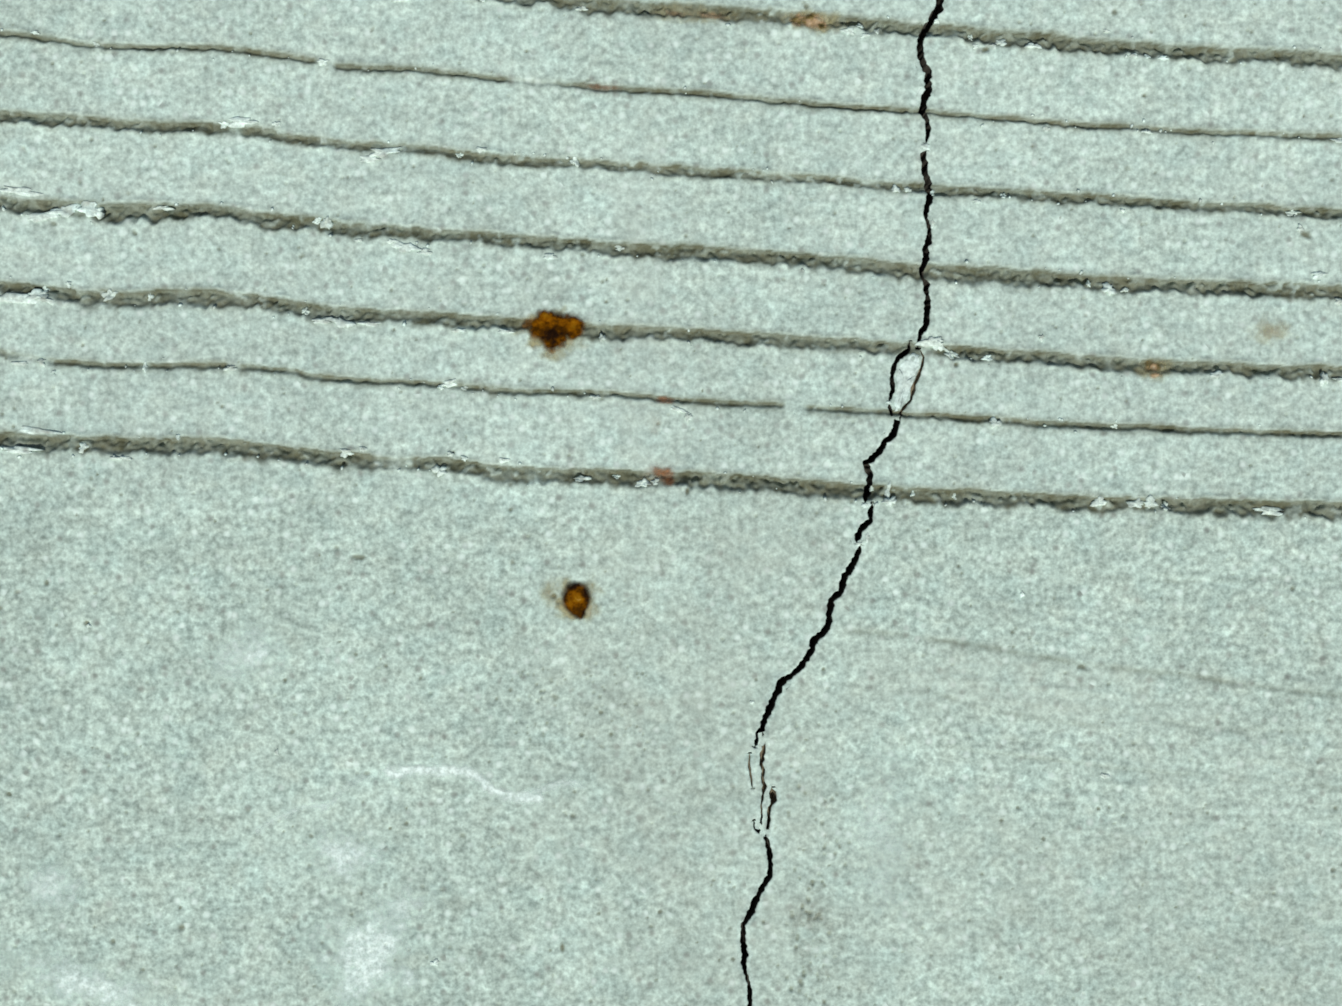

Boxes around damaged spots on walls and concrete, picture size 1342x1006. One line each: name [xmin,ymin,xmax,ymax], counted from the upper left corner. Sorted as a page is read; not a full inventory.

rust [523,311,584,359]
crack [740,0,944,1006]
rust [547,580,593,619]